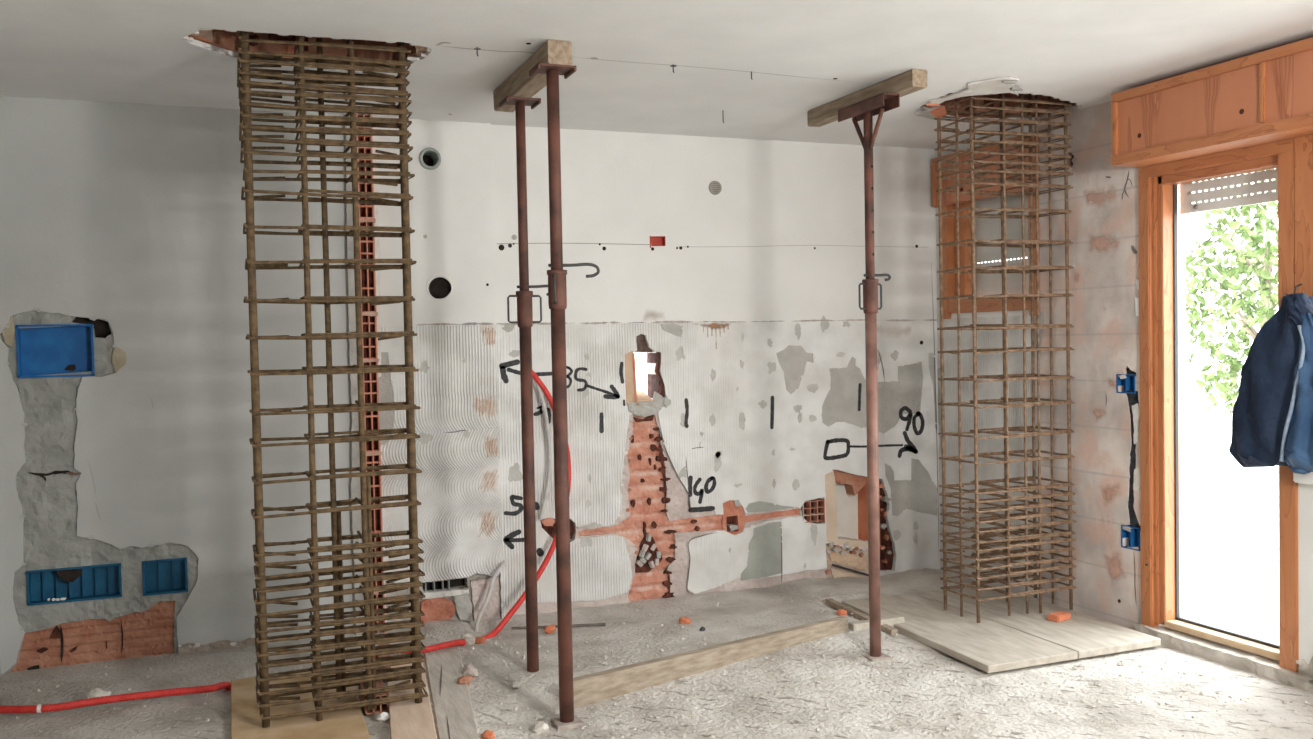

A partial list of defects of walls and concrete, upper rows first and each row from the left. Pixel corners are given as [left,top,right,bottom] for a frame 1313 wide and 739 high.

spalling [182,27,431,73]
peeling [915,76,1082,122]
flaking render [0,308,255,673]
flaking render [358,138,942,623]